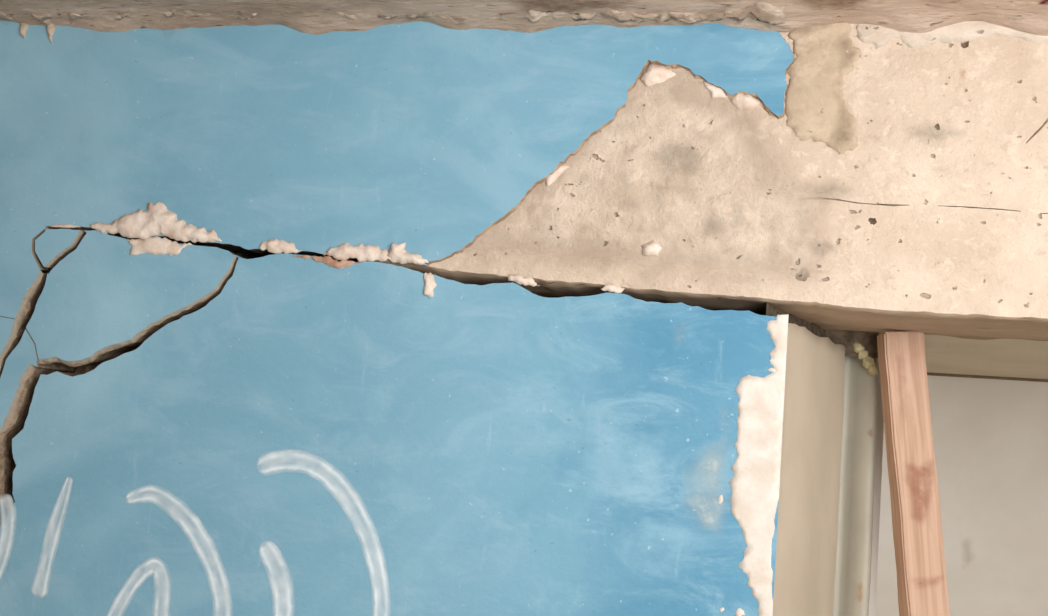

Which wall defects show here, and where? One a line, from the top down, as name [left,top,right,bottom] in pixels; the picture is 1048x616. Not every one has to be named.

flaking render [425,60,819,273]
flaking render [49,202,222,256]
crack [814,197,908,206]
crack [947,206,1048,214]
crack [508,274,625,293]
crack [0,226,437,526]
peeling [718,314,789,616]